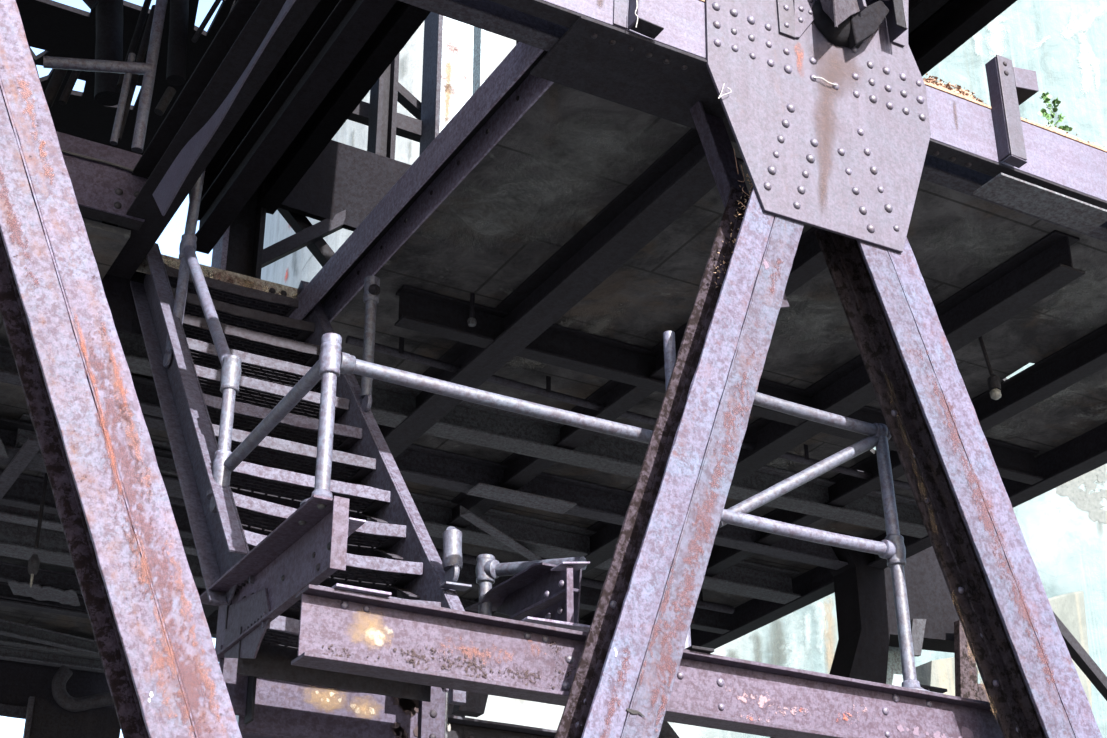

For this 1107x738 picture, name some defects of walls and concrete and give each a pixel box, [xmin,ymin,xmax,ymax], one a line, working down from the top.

rust [441,41,466,121]
rust [0,170,38,287]
rust [76,323,219,738]
rust [638,370,757,732]
rust [927,375,1059,688]
rust [602,649,630,738]
peeling [725,686,811,723]
peeling [897,724,980,738]
rust [951,592,997,714]